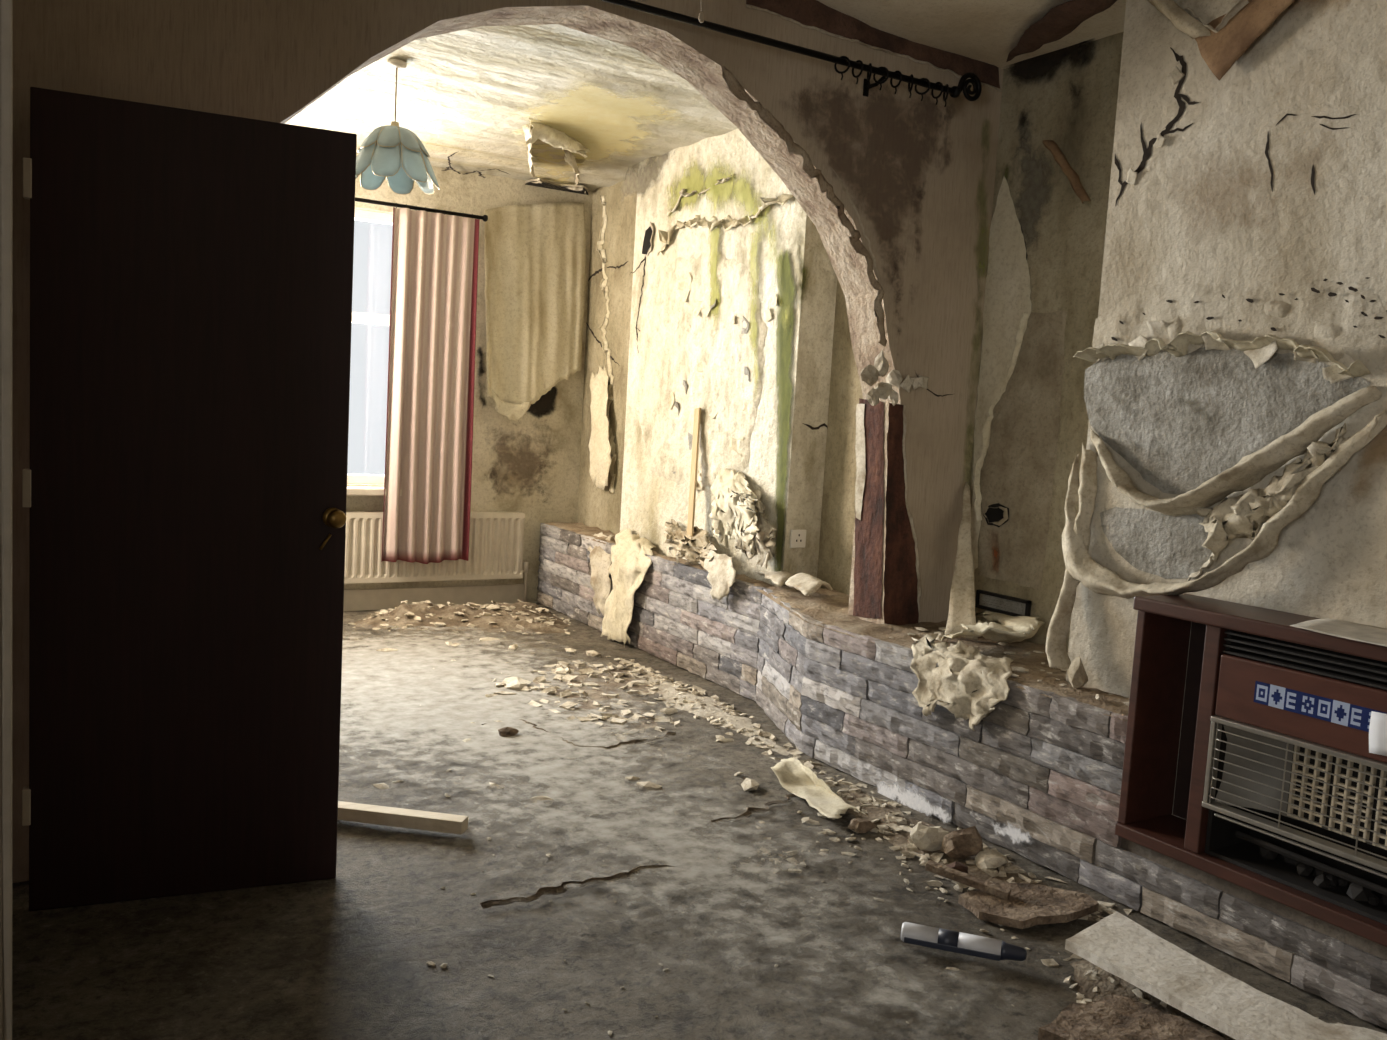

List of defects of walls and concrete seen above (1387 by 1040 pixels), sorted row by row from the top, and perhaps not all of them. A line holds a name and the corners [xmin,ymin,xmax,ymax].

spalling [1173,0,1249,33]
peeling [527,122,584,166]
spalling [525,178,589,194]
spalling [721,66,887,347]
leakage [799,92,951,281]
crack [1115,47,1199,206]
crack [1265,113,1356,195]
peeling [635,222,777,491]
spalling [971,176,1387,591]
leakage [490,434,550,493]